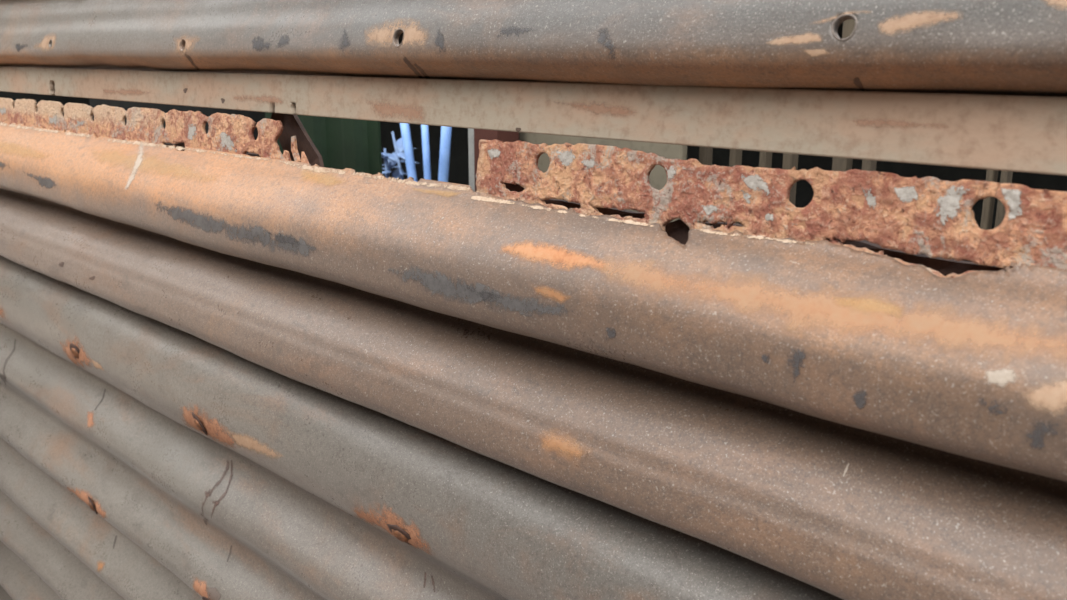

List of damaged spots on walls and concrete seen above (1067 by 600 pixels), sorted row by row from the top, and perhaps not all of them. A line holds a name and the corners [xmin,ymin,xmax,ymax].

rust [368,21,426,45]
rust [0,122,91,137]
rust [699,229,815,245]
crack [828,238,1006,276]
rust [503,242,1067,356]
rust [183,406,276,457]
rust [340,508,429,552]